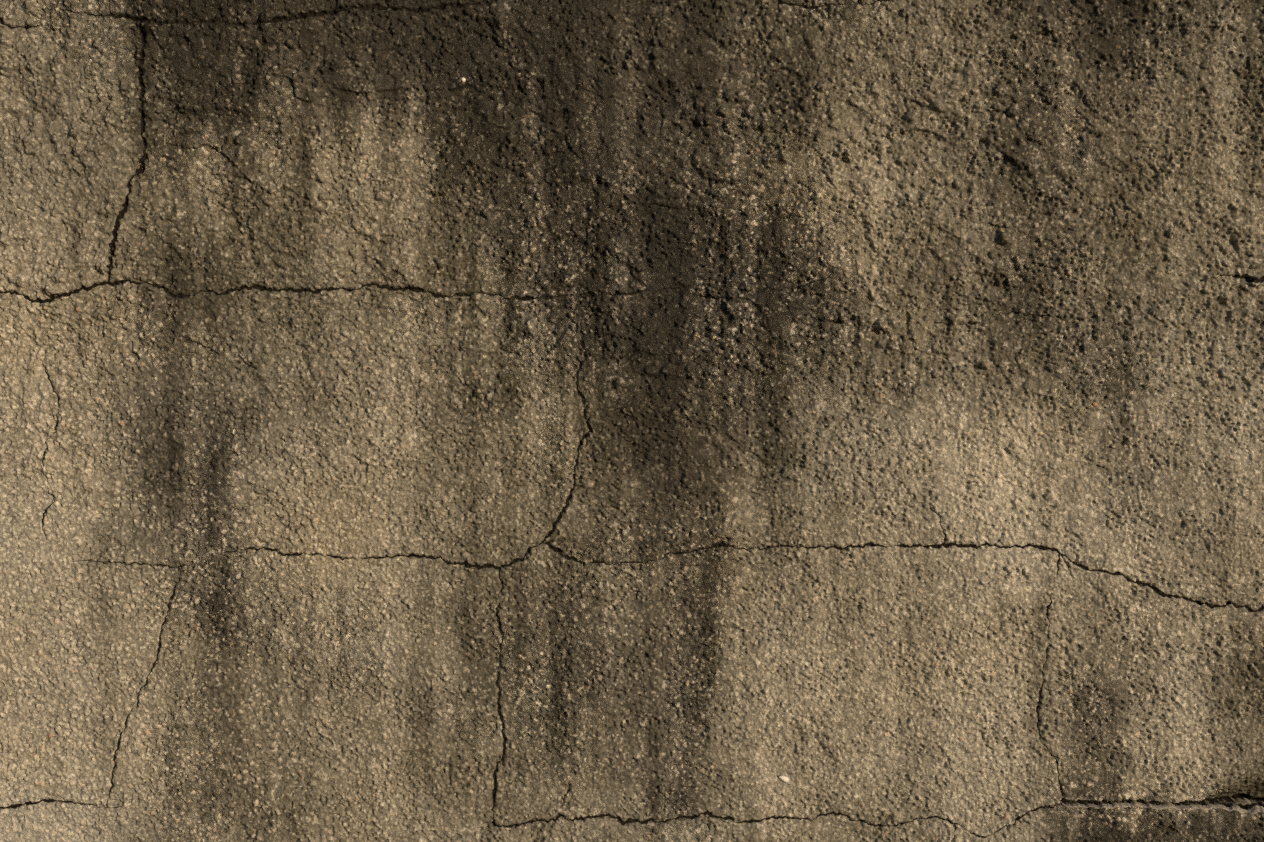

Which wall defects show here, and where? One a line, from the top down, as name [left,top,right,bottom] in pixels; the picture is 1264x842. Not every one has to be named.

crack [778,0,891,9]
crack [0,0,695,304]
crack [42,351,60,539]
water stain [127,0,762,790]
crack [734,273,833,292]
crack [934,311,1062,326]
crack [1208,274,1264,283]
crack [223,320,1264,842]
crack [0,560,193,809]
water stain [1060,780,1264,842]